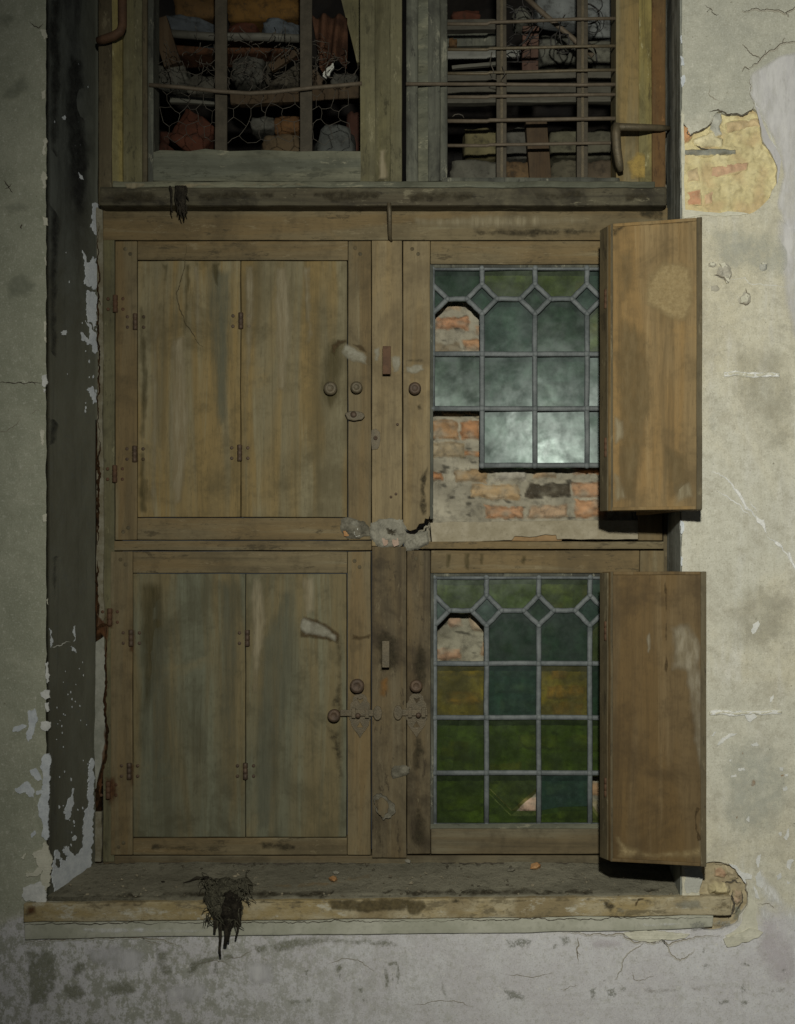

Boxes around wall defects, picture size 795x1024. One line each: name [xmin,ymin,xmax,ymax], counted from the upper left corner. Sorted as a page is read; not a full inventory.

crack [707,7,795,165]
peeling [90,203,98,235]
spalling [681,54,795,316]
peeling [81,250,98,363]
peeling [85,375,97,413]
flaking render [12,626,84,748]
flaking render [15,753,95,902]
crack [242,917,720,990]
spalling [678,854,794,947]